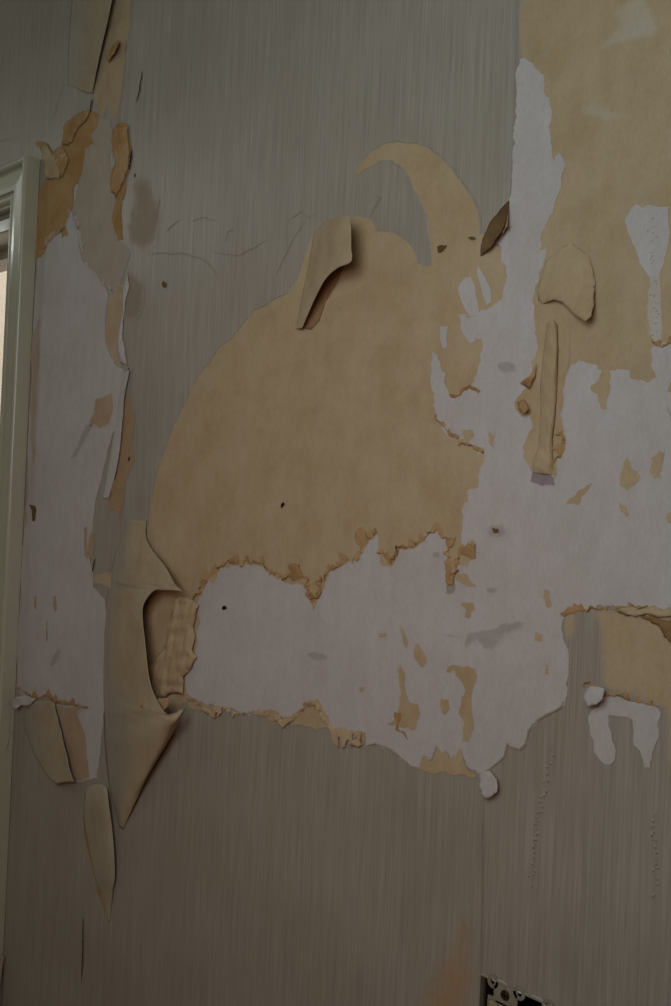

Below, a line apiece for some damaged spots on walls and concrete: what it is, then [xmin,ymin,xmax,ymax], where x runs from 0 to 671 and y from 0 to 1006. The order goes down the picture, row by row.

peeling [82,784,115,922]
peeling [10,0,509,829]
flaking render [185,0,671,798]
water stain [530,469,556,487]